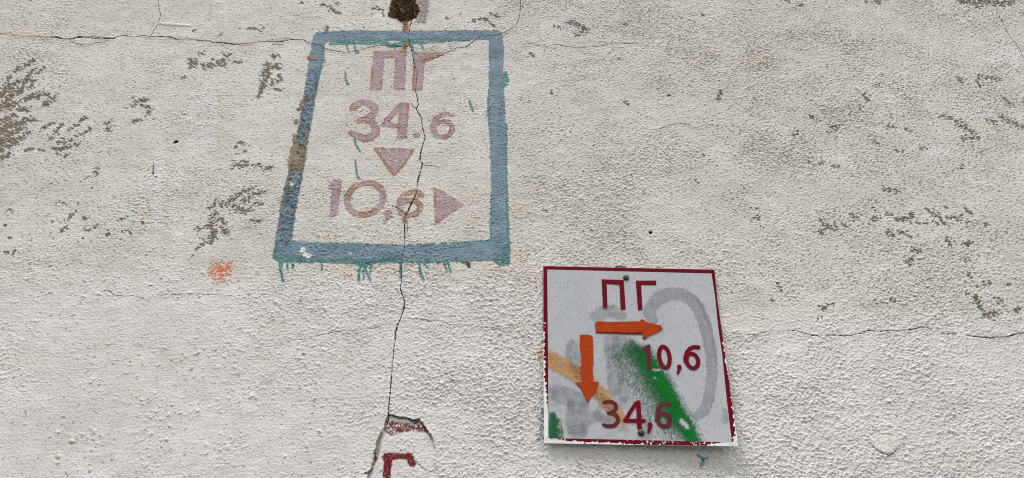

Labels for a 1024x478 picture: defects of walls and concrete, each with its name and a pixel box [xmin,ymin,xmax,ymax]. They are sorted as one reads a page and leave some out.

spalling [371,0,419,25]
peeling [0,58,114,162]
crack [2,0,626,414]
flaking render [364,414,433,478]